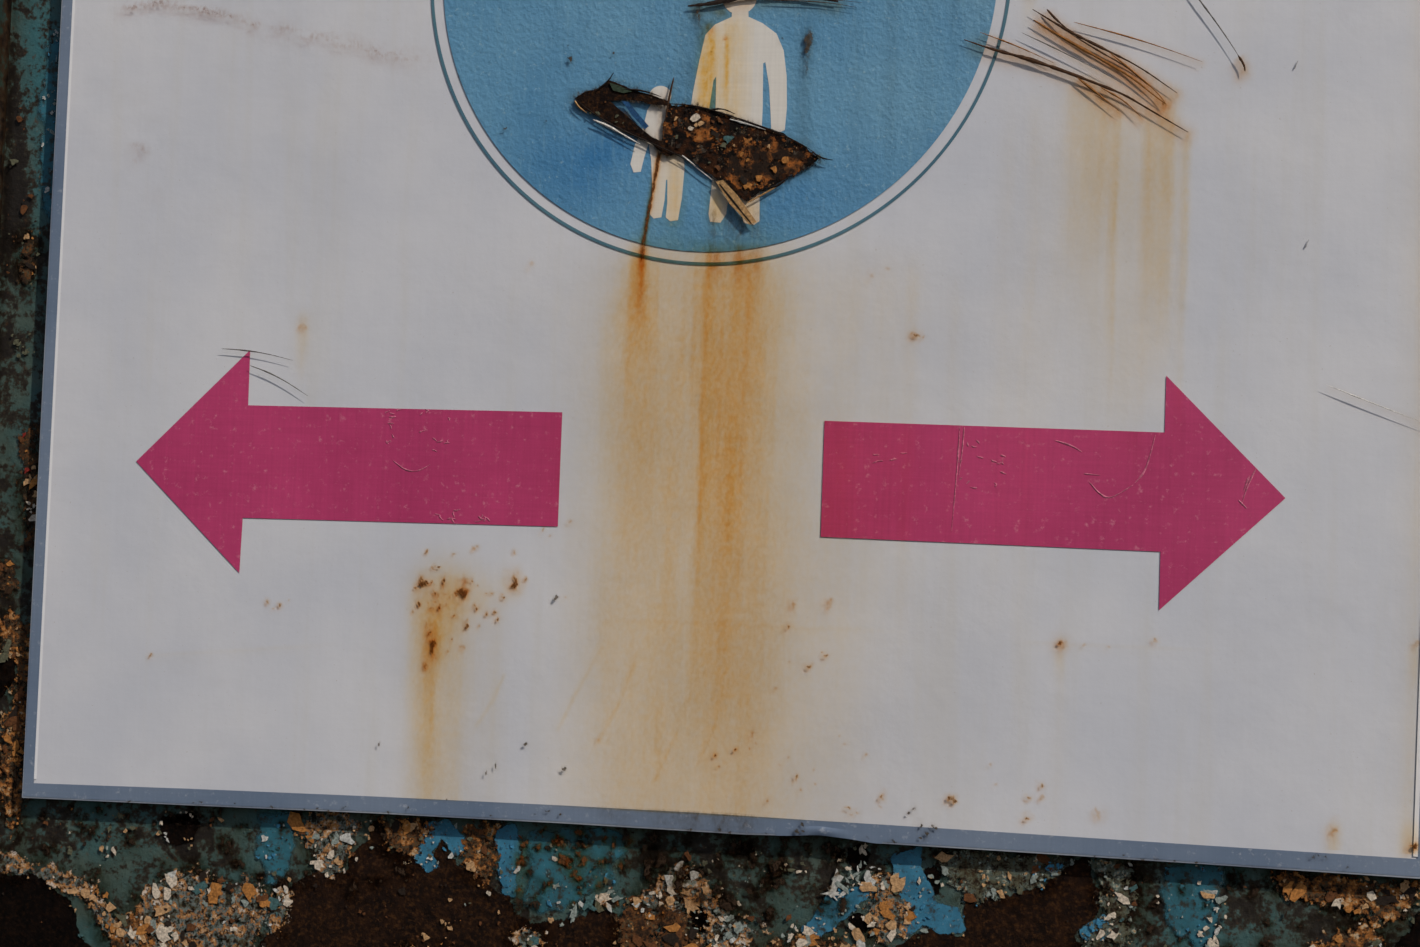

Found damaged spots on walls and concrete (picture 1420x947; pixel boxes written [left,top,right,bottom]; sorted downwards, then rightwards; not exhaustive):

rust [418,566,518,628]
peeling [0,423,1066,947]
peeling [1080,858,1147,947]
peeling [1156,863,1233,947]
peeling [1270,870,1420,947]